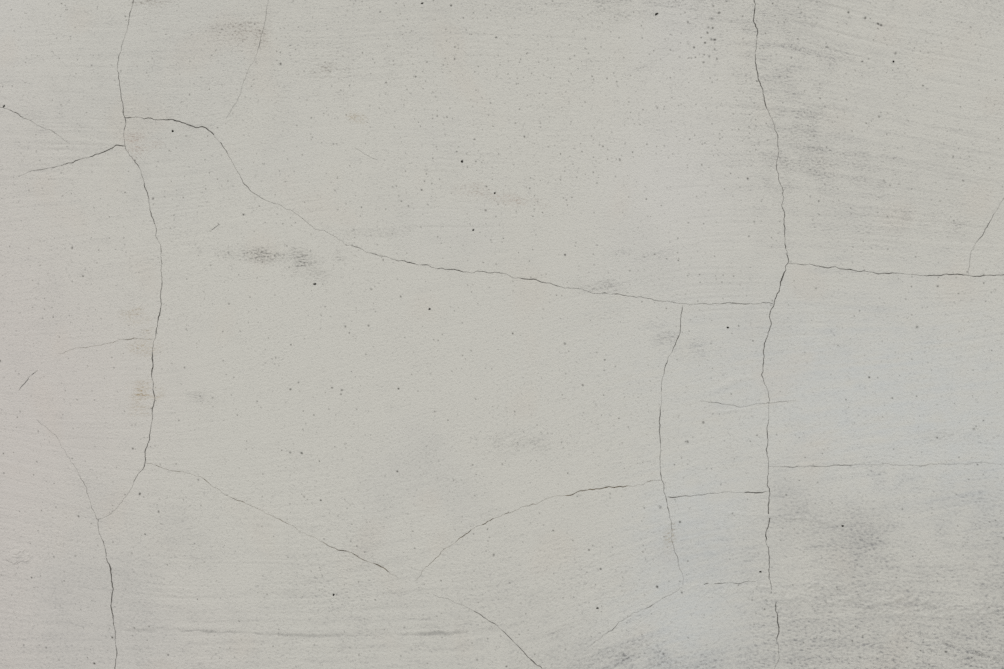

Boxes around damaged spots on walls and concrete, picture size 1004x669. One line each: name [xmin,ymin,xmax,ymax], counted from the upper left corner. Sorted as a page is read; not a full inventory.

crack [20,0,741,492]
crack [420,486,626,668]
crack [596,1,1004,669]